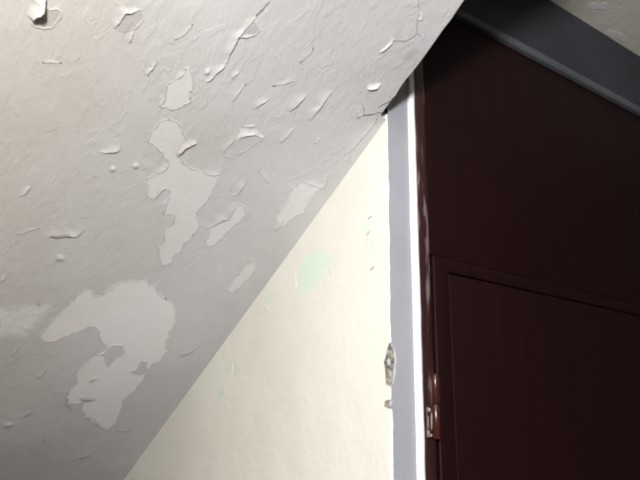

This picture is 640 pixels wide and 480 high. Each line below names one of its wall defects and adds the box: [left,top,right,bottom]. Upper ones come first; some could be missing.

peeling [26,0,64,31]
peeling [111,4,144,43]
peeling [144,66,248,266]
peeling [220,122,265,159]
peeling [270,174,327,231]
peeling [0,279,178,430]